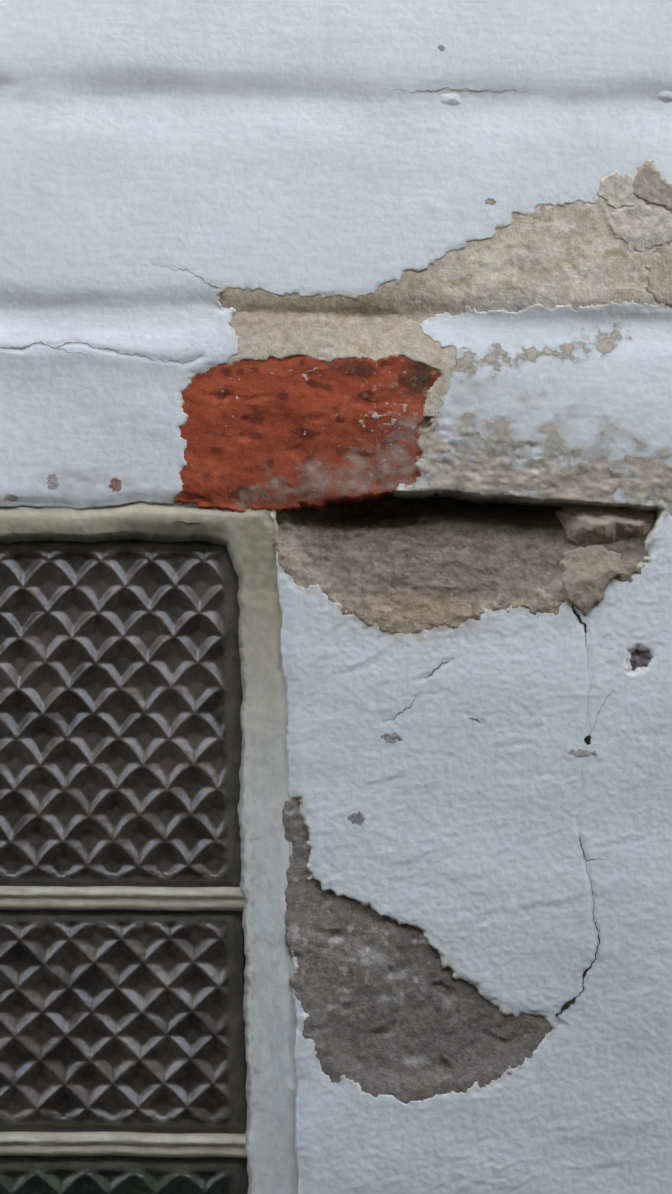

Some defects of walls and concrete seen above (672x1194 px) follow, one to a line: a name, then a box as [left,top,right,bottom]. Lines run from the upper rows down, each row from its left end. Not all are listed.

peeling [175,160,672,634]
crack [572,604,614,761]
peeling [630,649,652,671]
flaking render [282,798,552,1104]
crack [555,793,607,1017]